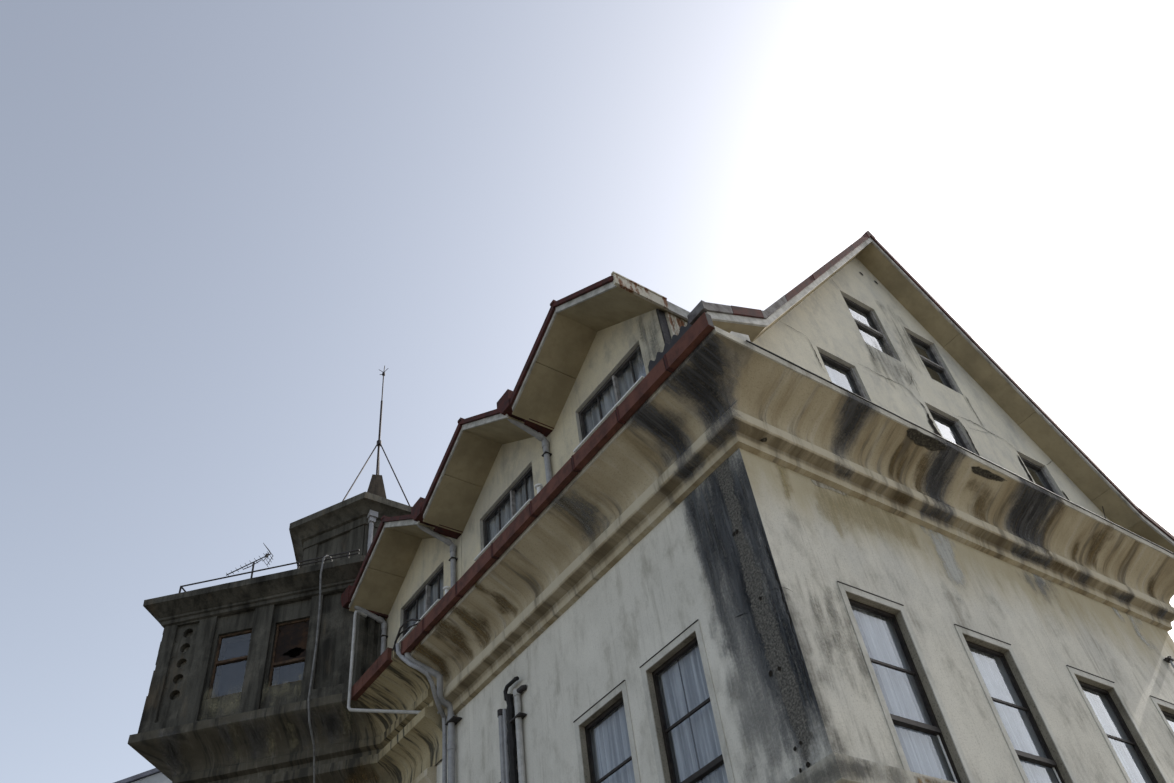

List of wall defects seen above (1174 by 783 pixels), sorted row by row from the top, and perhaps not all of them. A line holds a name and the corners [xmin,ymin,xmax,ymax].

damp [663,332,737,445]
damp [833,392,872,478]
crack [867,346,1051,482]
damp [413,641,449,677]
damp [437,607,490,657]
damp [474,582,517,615]
damp [631,399,869,783]
damp [898,437,966,585]
damp [1006,478,1110,594]
damp [1113,594,1149,645]